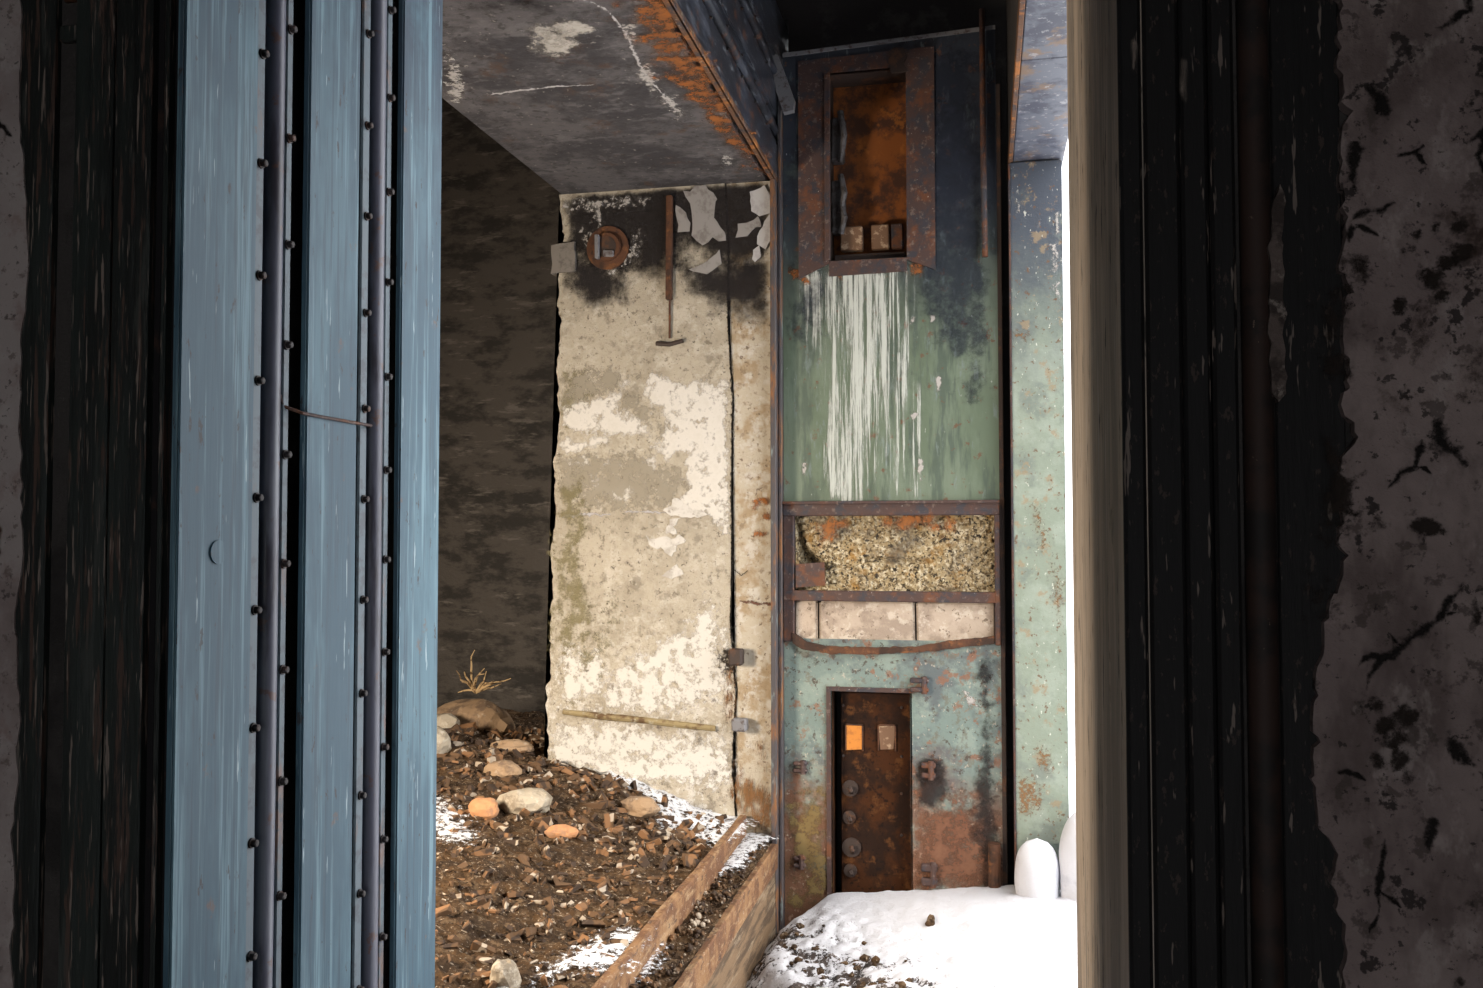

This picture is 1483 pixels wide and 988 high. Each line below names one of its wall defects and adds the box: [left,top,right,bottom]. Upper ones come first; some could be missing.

peeling [531,21,594,57]
peeling [637,63,684,117]
rust [613,0,768,173]
crack [1440,0,1473,28]
crack [1346,83,1396,243]
crack [1466,128,1483,172]
peeling [675,185,770,274]
peeling [556,365,730,579]
crack [1388,420,1468,488]
crack [1361,584,1463,681]
spalling [550,602,732,791]
rust [913,767,988,890]